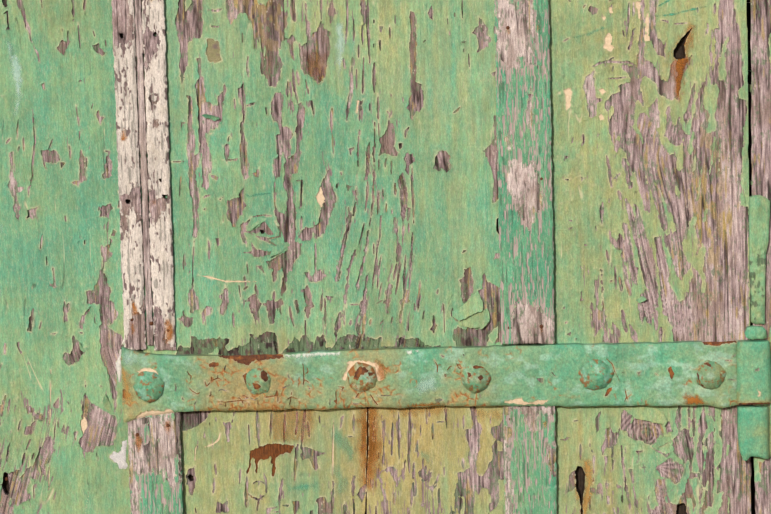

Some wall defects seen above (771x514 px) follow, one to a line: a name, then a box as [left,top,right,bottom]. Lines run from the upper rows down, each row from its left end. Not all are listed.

corrosion [676,58,688,96]
peeling [561,0,771,343]
peeling [55,0,555,514]
corrosion [209,354,286,393]
corrosion [352,364,384,382]
peeling [0,403,57,514]
corrosion [246,443,294,477]
crack [175,363,465,514]
corrosion [360,407,379,484]
peeling [545,442,576,495]
crack [572,490,623,514]
peeling [589,391,771,514]